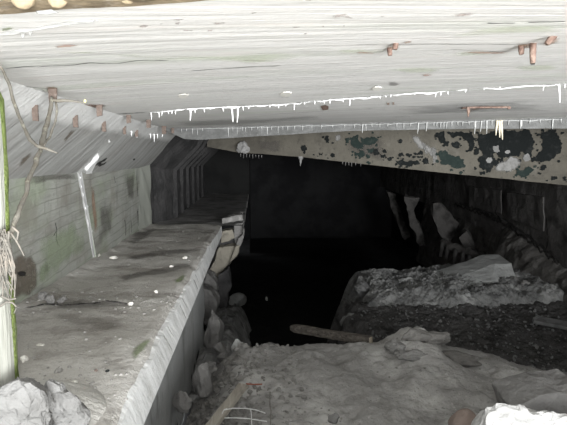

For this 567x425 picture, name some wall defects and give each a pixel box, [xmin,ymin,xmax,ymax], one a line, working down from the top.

efflorescence [148,84,566,136]
peeling [345,129,564,180]
crack [29,300,128,308]